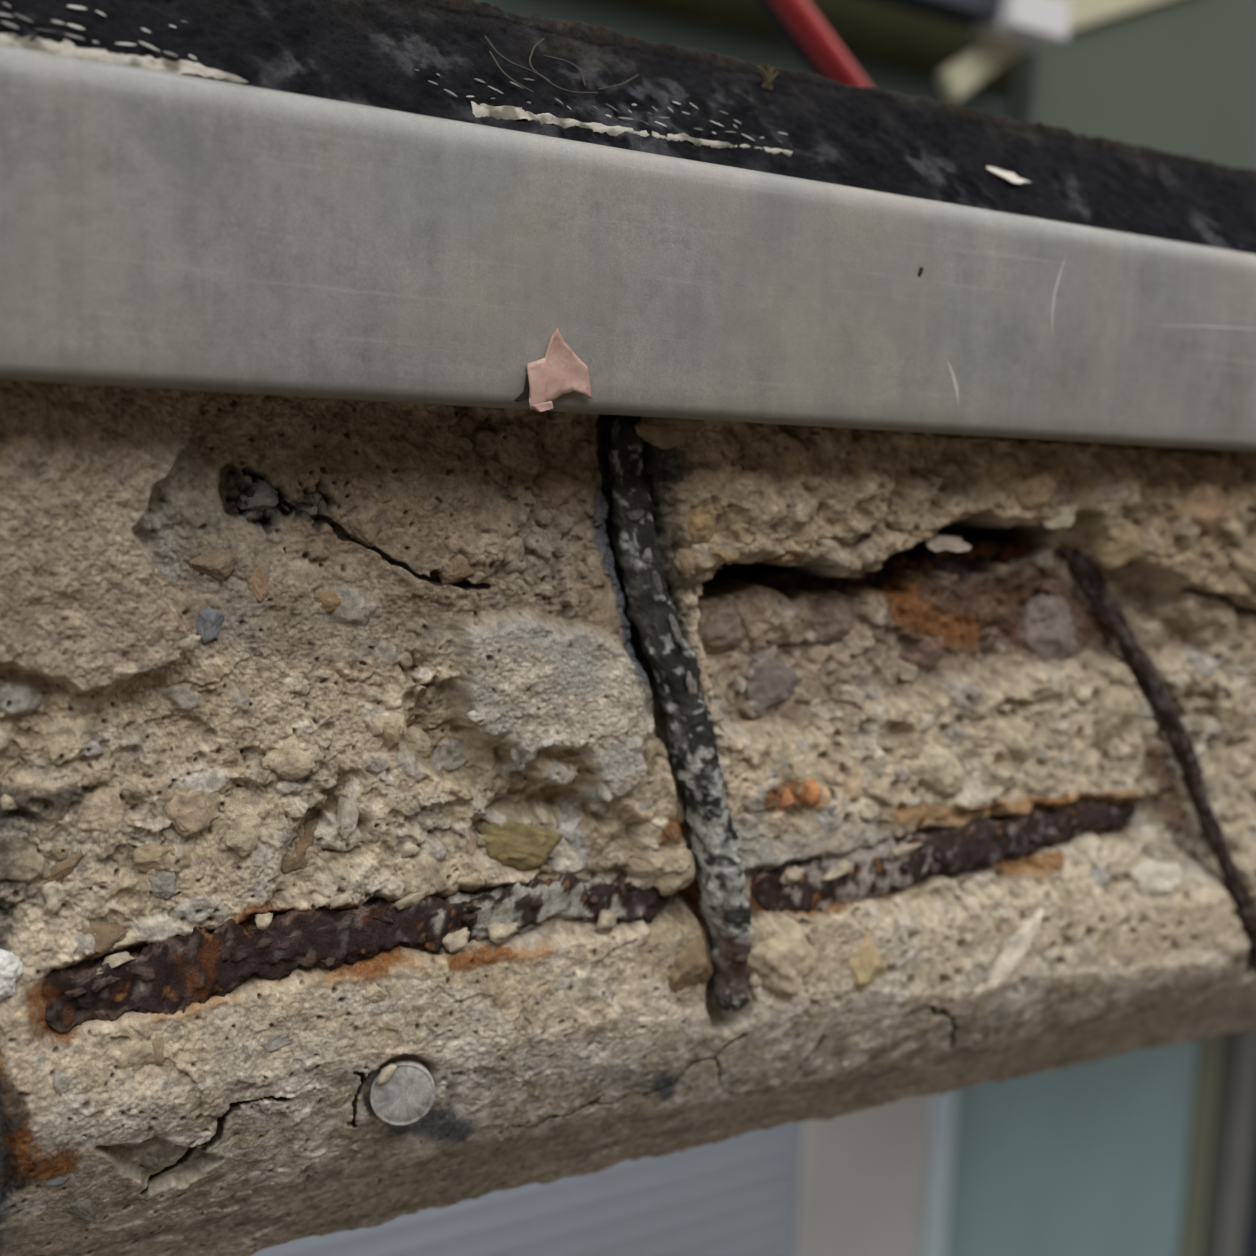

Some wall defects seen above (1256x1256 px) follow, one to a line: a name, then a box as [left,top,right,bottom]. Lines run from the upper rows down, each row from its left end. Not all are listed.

crack [259,476,491,590]
spalling [0,391,1256,1118]
rust [895,744,1190,840]
rust [80,944,147,961]
rust [156,996,222,1018]
rust [229,902,358,928]
rust [326,947,414,982]
rust [448,946,553,970]
rust [661,817,706,925]
crack [140,1096,291,1194]
crack [350,1071,370,1128]
crack [498,1033,825,1133]